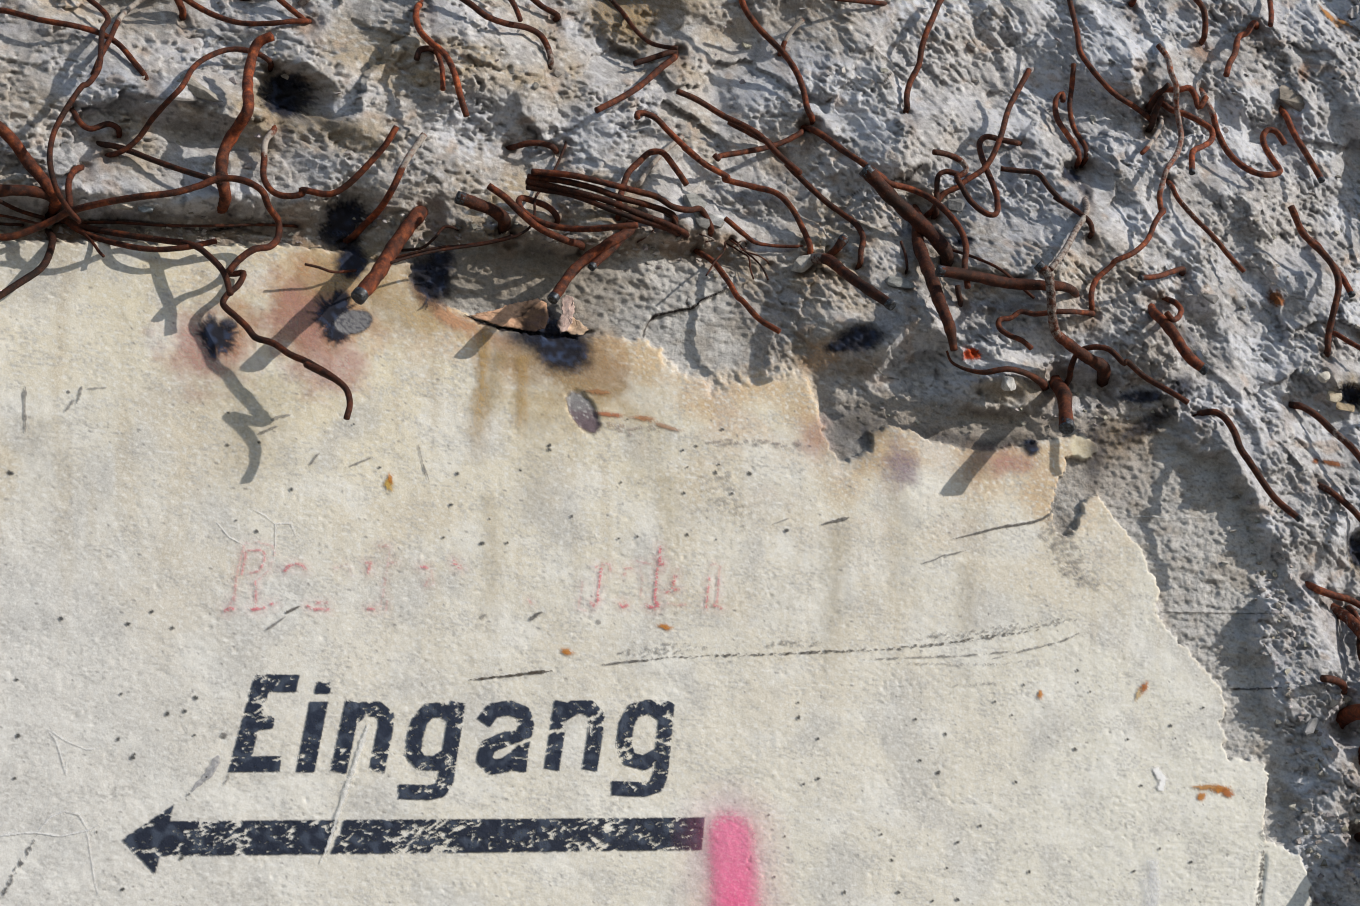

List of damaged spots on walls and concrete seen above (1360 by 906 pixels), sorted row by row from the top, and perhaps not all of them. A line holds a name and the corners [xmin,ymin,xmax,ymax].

rust [1320,6,1353,28]
spalling [0,0,105,178]
spalling [0,137,41,187]
spalling [0,196,49,234]
spalling [15,0,1178,415]
leakage [278,261,361,352]
rust [1266,289,1284,307]
leakage [501,346,622,398]
rust [963,348,981,359]
spalling [566,391,656,435]
rust [598,412,678,431]
spalling [819,0,1360,906]